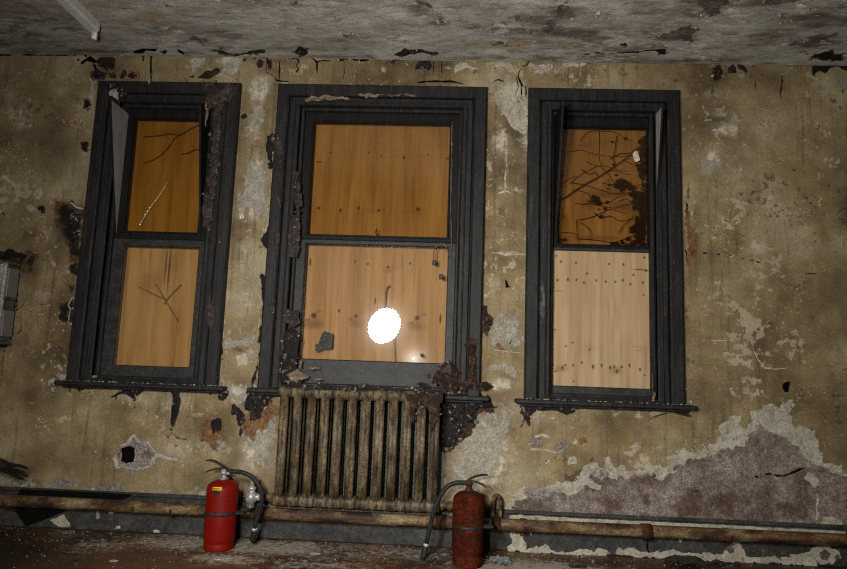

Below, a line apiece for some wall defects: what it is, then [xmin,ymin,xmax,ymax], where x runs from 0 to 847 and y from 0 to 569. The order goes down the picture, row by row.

peeling [389,48,439,71]
spalling [493,88,528,135]
water stain [37,201,84,275]
spalling [112,434,179,477]
spalling [505,382,847,534]
peeling [507,531,841,566]